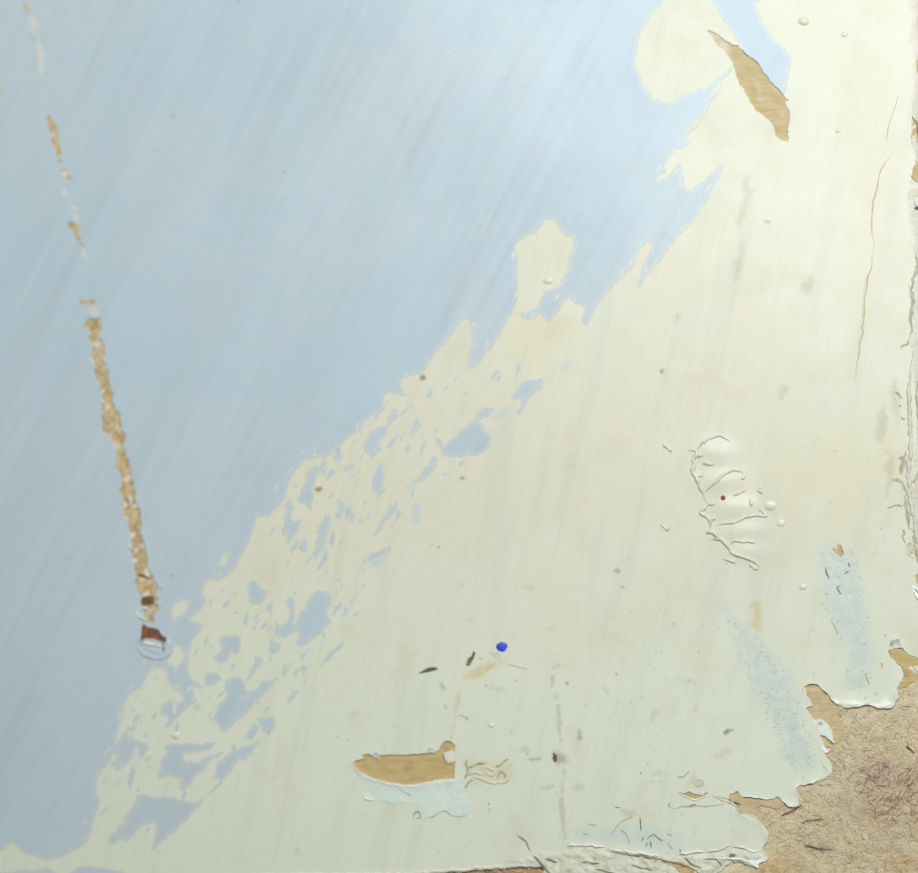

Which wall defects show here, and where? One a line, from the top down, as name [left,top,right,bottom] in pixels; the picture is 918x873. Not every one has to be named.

peeling [635,0,790,145]
peeling [136,356,574,732]
peeling [97,699,276,849]
peeling [354,741,470,819]
peeling [679,791,709,801]
peeling [717,639,918,873]